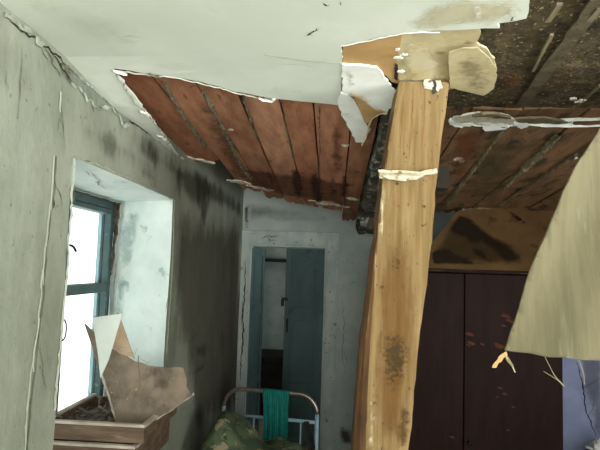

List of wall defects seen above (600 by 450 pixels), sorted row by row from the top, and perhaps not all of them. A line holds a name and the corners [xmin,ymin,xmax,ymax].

flaking render [68,73,130,129]
peeling [112,69,276,156]
spalling [448,111,600,131]
leakage [178,174,248,222]
flaking render [227,179,274,192]
flaking render [308,197,358,208]
crack [4,12,113,450]
crack [239,264,247,381]
crack [576,362,600,436]